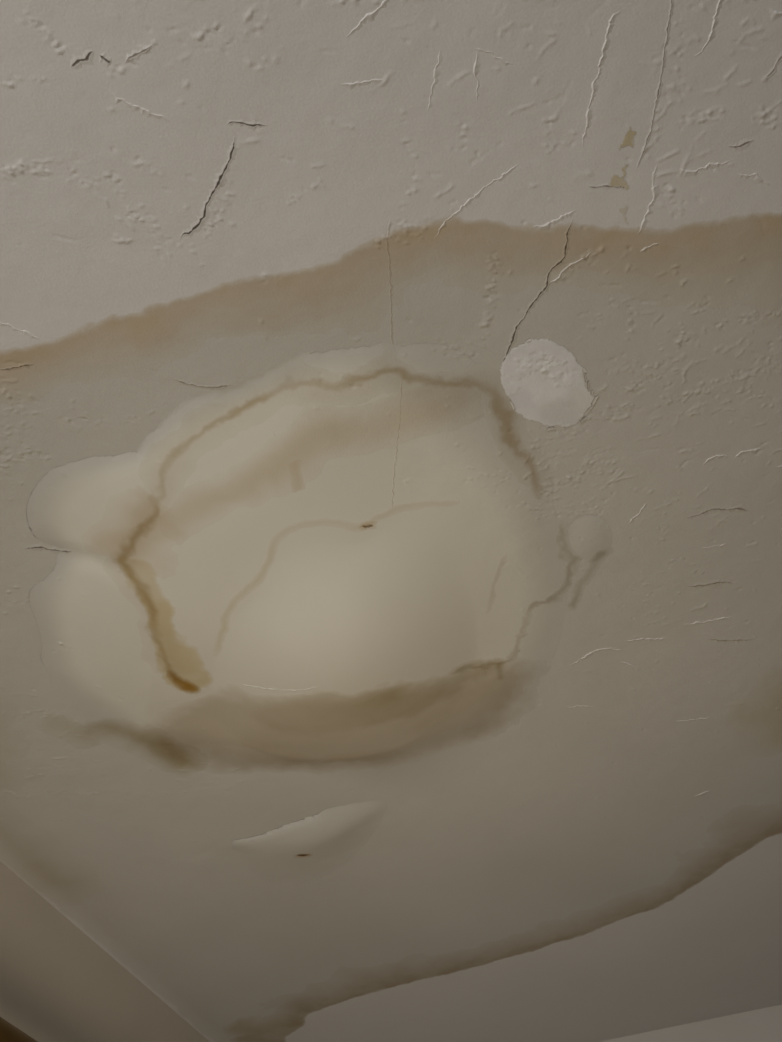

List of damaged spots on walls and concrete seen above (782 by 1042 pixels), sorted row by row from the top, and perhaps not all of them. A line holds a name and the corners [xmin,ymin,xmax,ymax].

crack [346,0,390,38]
crack [179,119,268,240]
crack [433,163,520,240]
crack [502,0,770,362]
peeling [500,338,598,430]
crack [703,448,761,465]
water stain [0,211,782,1042]